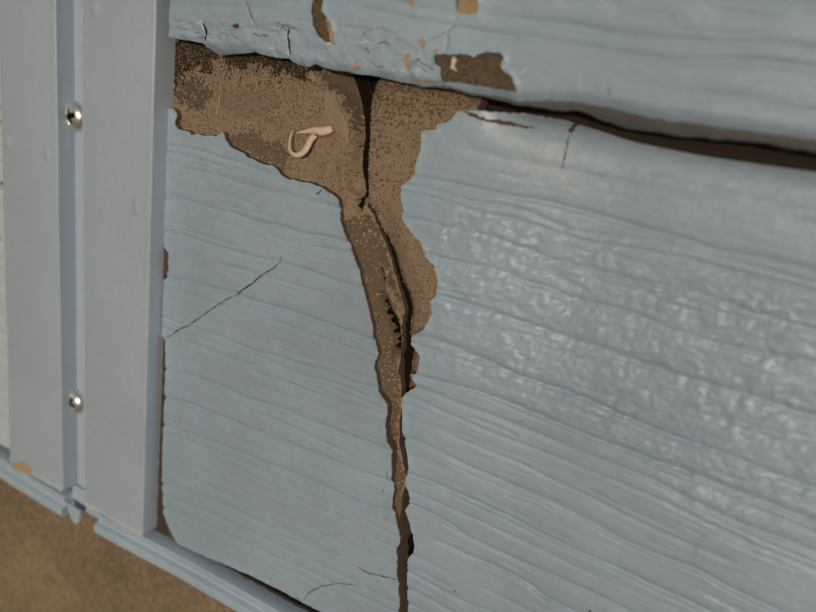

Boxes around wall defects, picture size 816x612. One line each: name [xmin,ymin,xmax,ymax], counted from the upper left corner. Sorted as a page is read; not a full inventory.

peeling [313,0,335,45]
peeling [457,0,478,14]
crack [163,257,281,339]
spalling [173,22,539,519]
crack [352,73,415,393]
spalling [152,340,176,541]
crack [302,567,398,601]
crack [407,532,415,558]